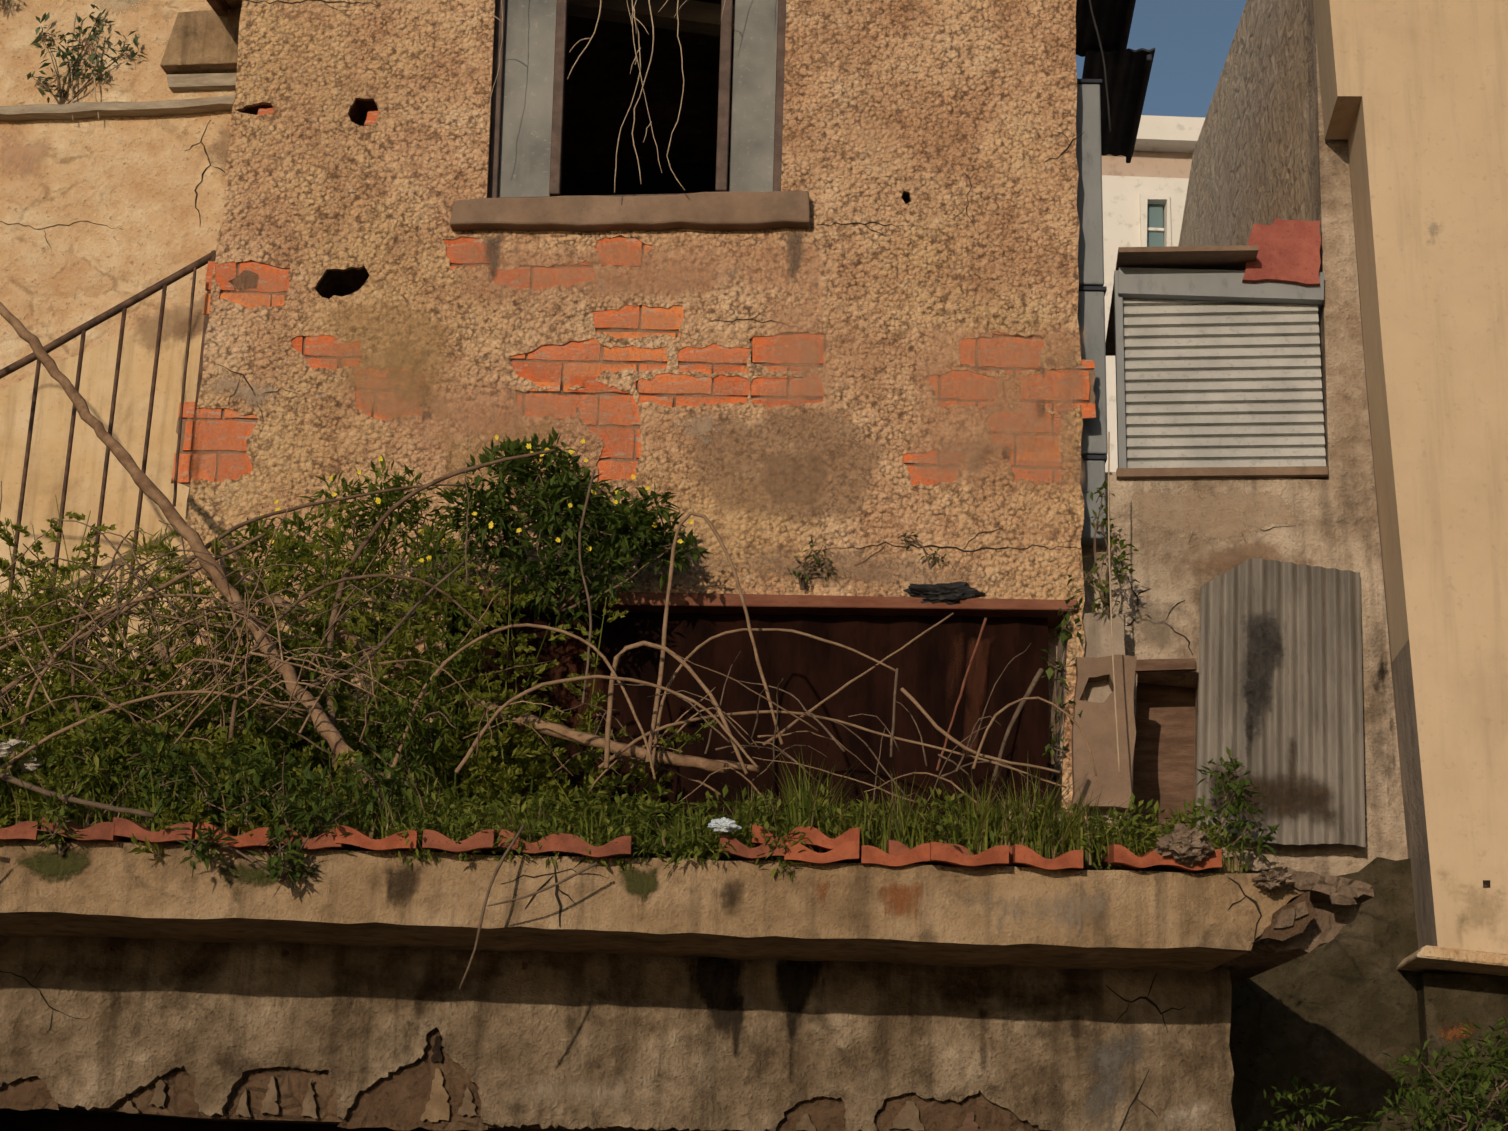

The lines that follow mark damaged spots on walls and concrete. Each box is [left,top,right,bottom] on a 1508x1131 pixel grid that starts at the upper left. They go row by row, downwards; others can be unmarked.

crack [184,120,225,223]
flaking render [202,260,290,315]
flaking render [510,305,828,482]
flaking render [171,402,258,488]
spalling [1255,891,1357,942]
leakage [689,957,750,1056]
leakage [776,960,829,1079]
crack [1105,973,1186,1033]
spalling [337,1028,488,1131]
spalling [776,1096,846,1131]
spalling [874,1092,1049,1131]
crack [1119,1069,1156,1131]